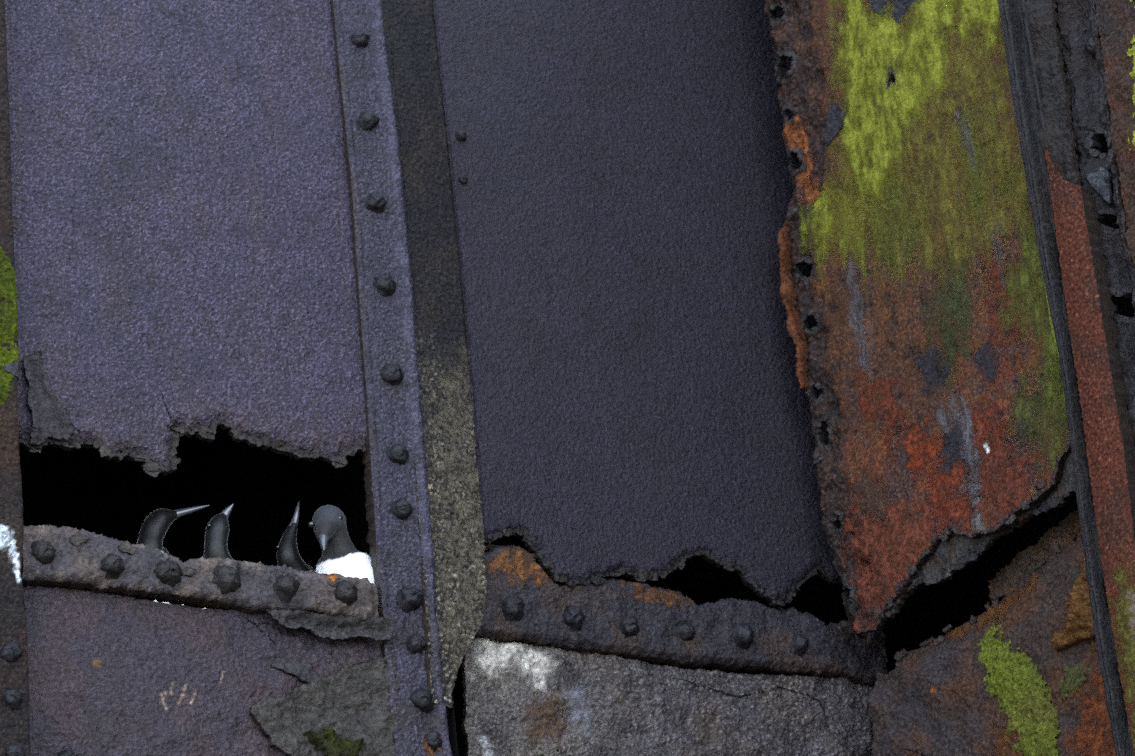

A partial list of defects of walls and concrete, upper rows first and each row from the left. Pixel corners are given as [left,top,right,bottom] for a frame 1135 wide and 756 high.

corrosion [782,116,820,201]
corrosion [778,222,810,391]
peeling [118,542,137,555]
peeling [142,455,181,478]
corrosion [843,379,1052,638]
corrosion [1050,558,1096,651]